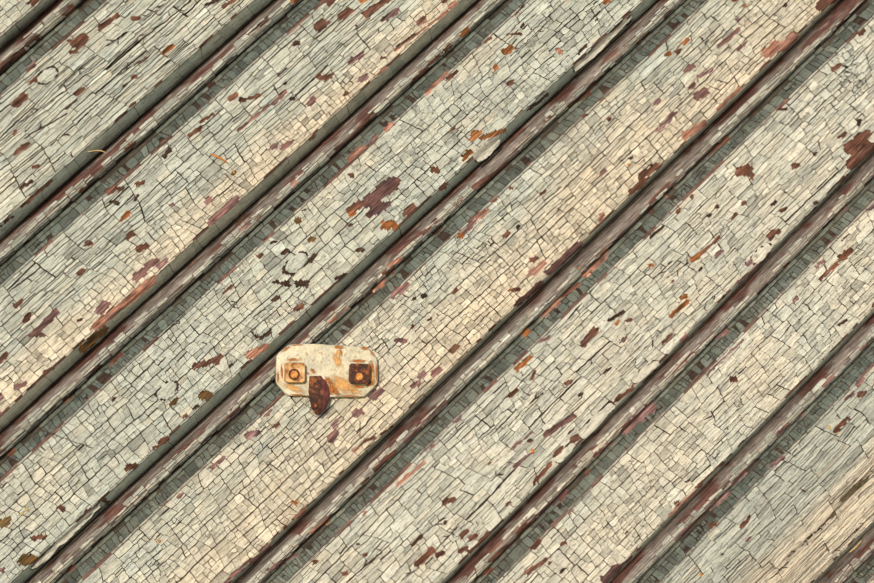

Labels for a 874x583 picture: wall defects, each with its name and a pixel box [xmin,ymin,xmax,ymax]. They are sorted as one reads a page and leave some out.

peeling [65,5,143,57]
crack [18,0,192,146]
peeling [791,112,874,183]
peeling [341,168,419,232]
peeling [12,173,171,354]
crack [228,285,254,313]
peeling [169,349,234,421]
corrosion [277,344,302,395]
corrosion [325,346,377,396]
crack [346,549,382,583]
crack [429,514,459,549]
crack [770,513,874,583]